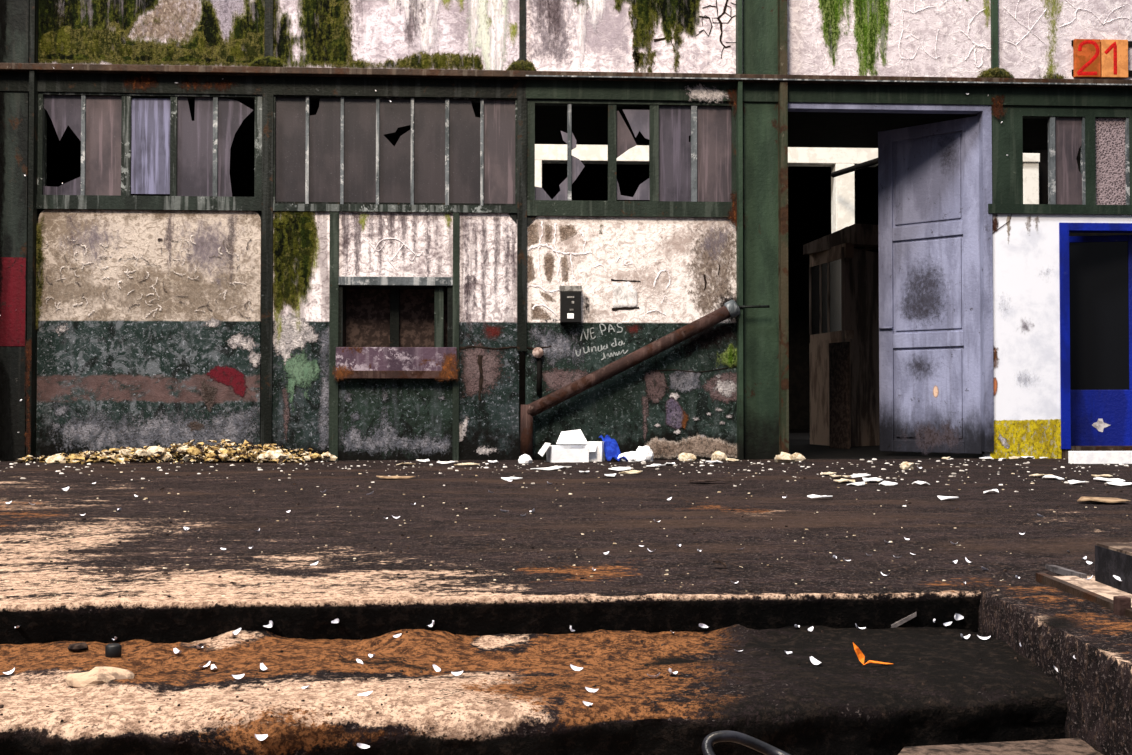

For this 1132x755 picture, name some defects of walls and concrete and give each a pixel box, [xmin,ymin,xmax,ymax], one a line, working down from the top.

damp [130,0,201,42]
damp [388,0,517,70]
damp [529,0,700,67]
crack [654,0,736,58]
damp [818,0,891,76]
damp [273,214,314,312]
damp [687,226,736,316]
corrosion [332,365,354,381]
corrosion [435,353,460,382]